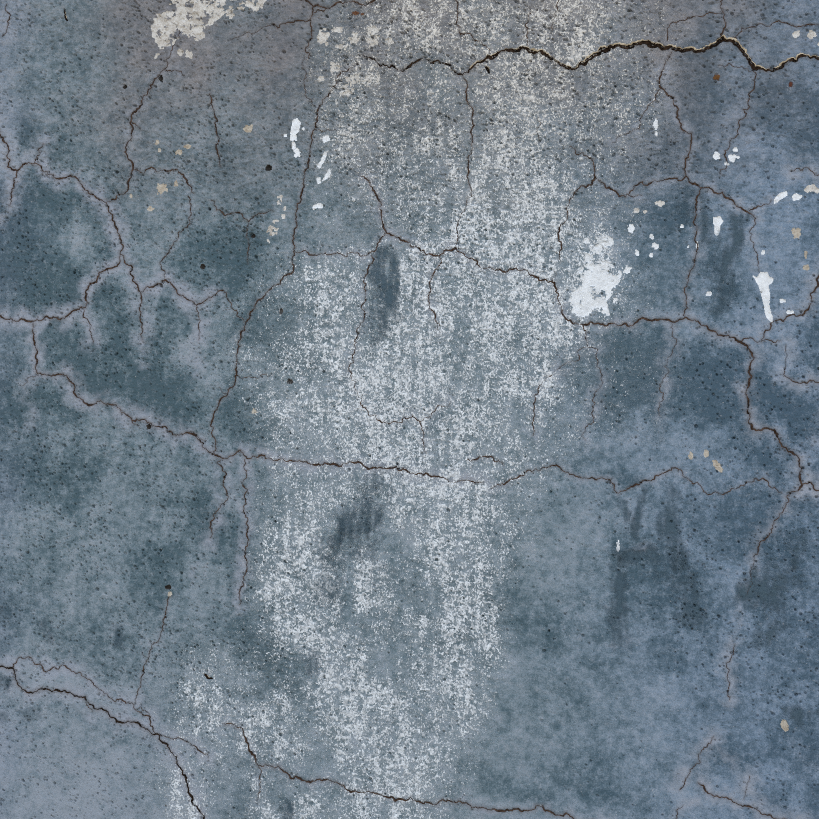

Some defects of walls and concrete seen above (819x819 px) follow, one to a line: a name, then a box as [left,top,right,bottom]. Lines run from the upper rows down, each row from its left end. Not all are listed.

peeling [151,0,267,59]
crack [0,0,819,604]
peeling [569,236,632,317]
peeling [753,272,773,322]
water stain [143,0,667,819]
water stain [658,510,686,570]
crack [0,597,208,819]
crack [226,723,574,819]
crack [676,740,785,819]